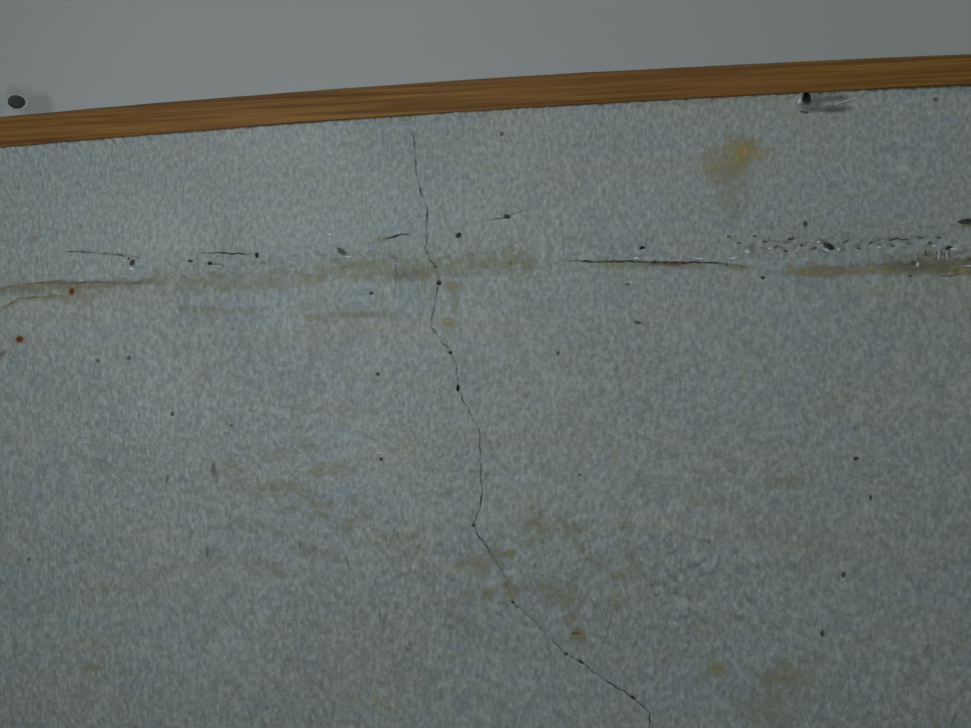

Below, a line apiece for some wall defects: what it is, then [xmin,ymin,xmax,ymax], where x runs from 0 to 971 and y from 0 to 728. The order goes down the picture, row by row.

crack [582,238,750,270]